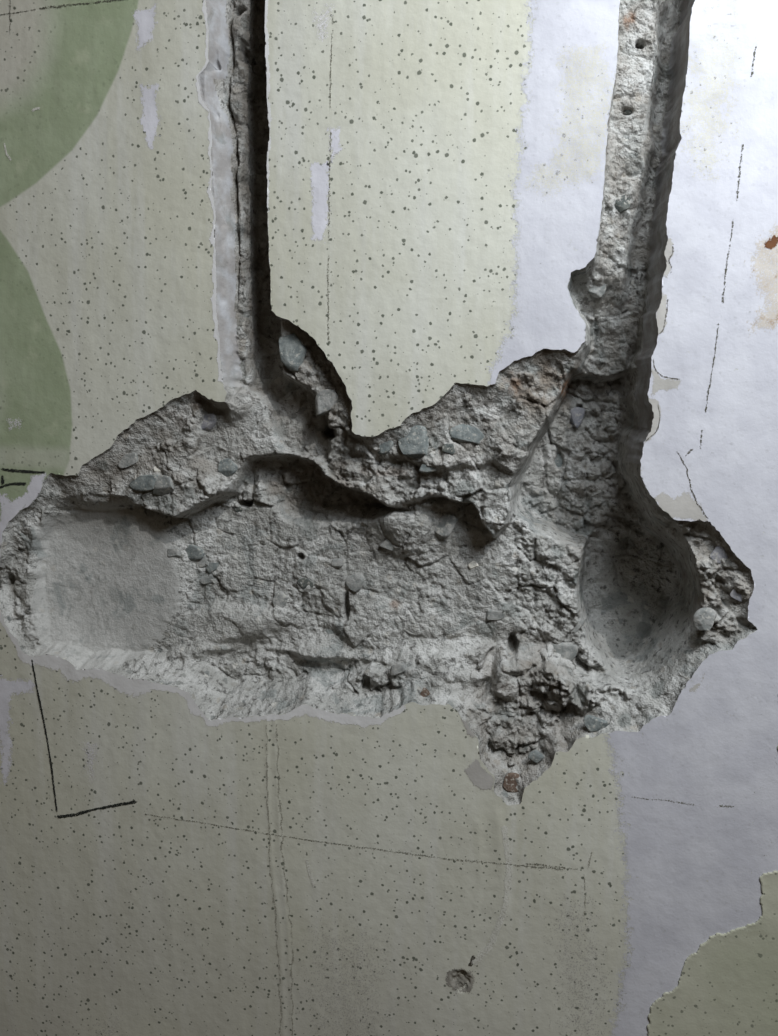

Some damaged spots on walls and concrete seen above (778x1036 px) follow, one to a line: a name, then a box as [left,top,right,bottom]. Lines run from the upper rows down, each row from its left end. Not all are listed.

spalling [0,0,757,805]
peeling [603,0,778,1036]
corrosion [747,225,778,338]